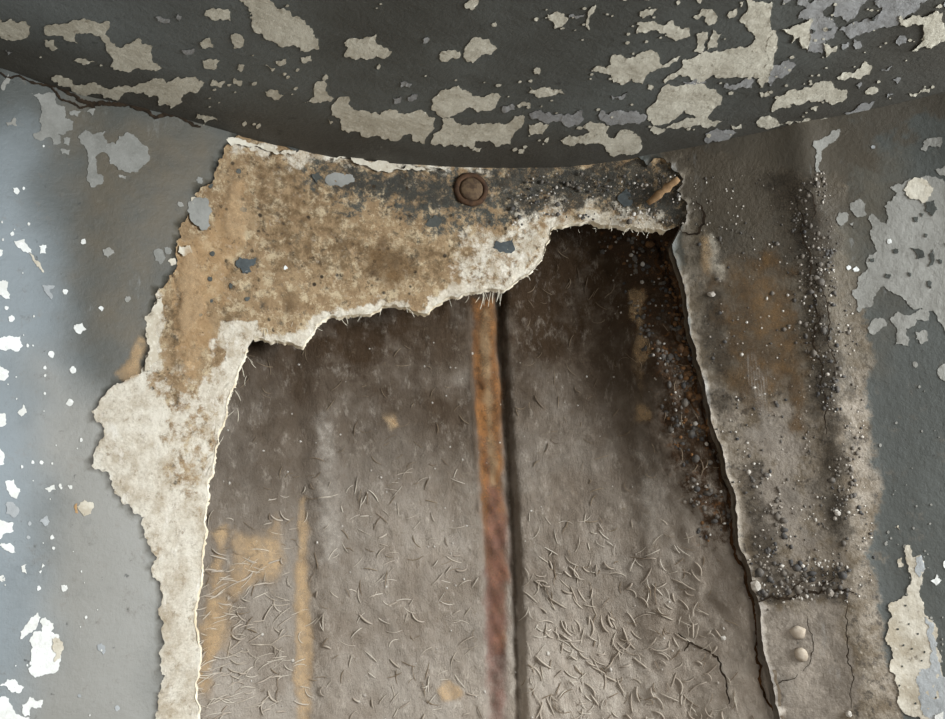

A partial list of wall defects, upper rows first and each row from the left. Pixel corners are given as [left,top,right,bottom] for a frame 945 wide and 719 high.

crack [0,72,201,128]
peeling [33,18,244,187]
peeling [756,61,878,129]
water stain [704,236,724,280]
peeling [836,166,945,346]
spalling [91,0,796,719]
corrosion [474,300,507,718]
crack [654,185,854,719]
water stain [746,462,845,602]
peeling [20,613,64,678]
corrosion [294,520,311,719]
peeling [885,545,945,719]